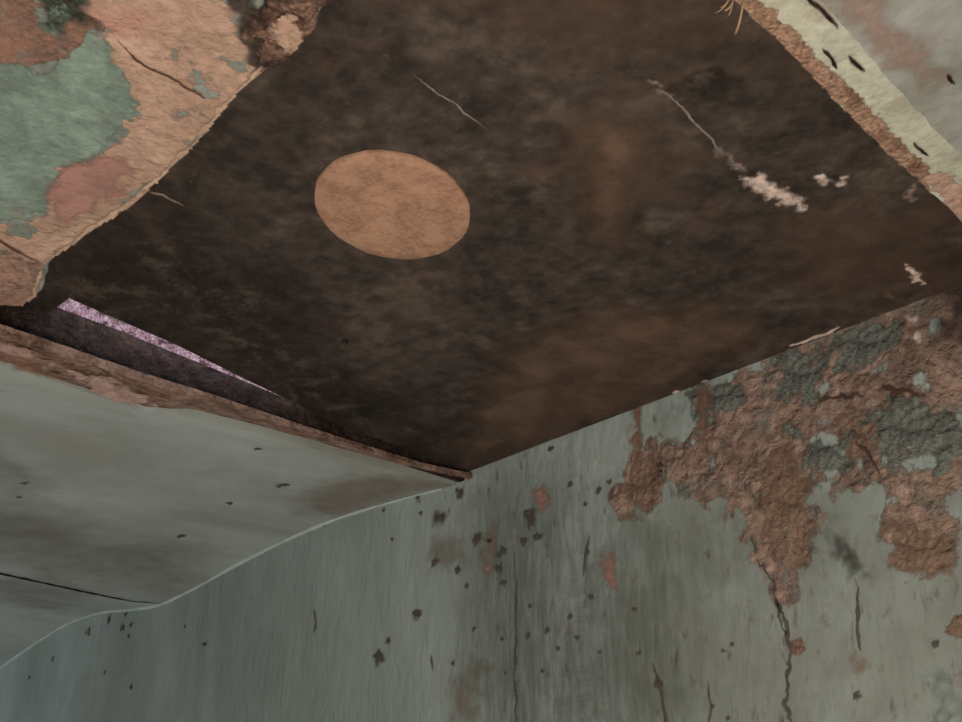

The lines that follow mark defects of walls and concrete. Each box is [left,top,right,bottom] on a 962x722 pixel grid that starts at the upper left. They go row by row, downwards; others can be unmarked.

peeling [0,0,327,306]
crack [807,0,838,29]
crack [823,50,865,72]
flaking render [735,0,962,221]
peeling [608,286,962,607]
crack [751,538,792,722]
peeling [791,637,806,656]
peeling [945,615,962,638]